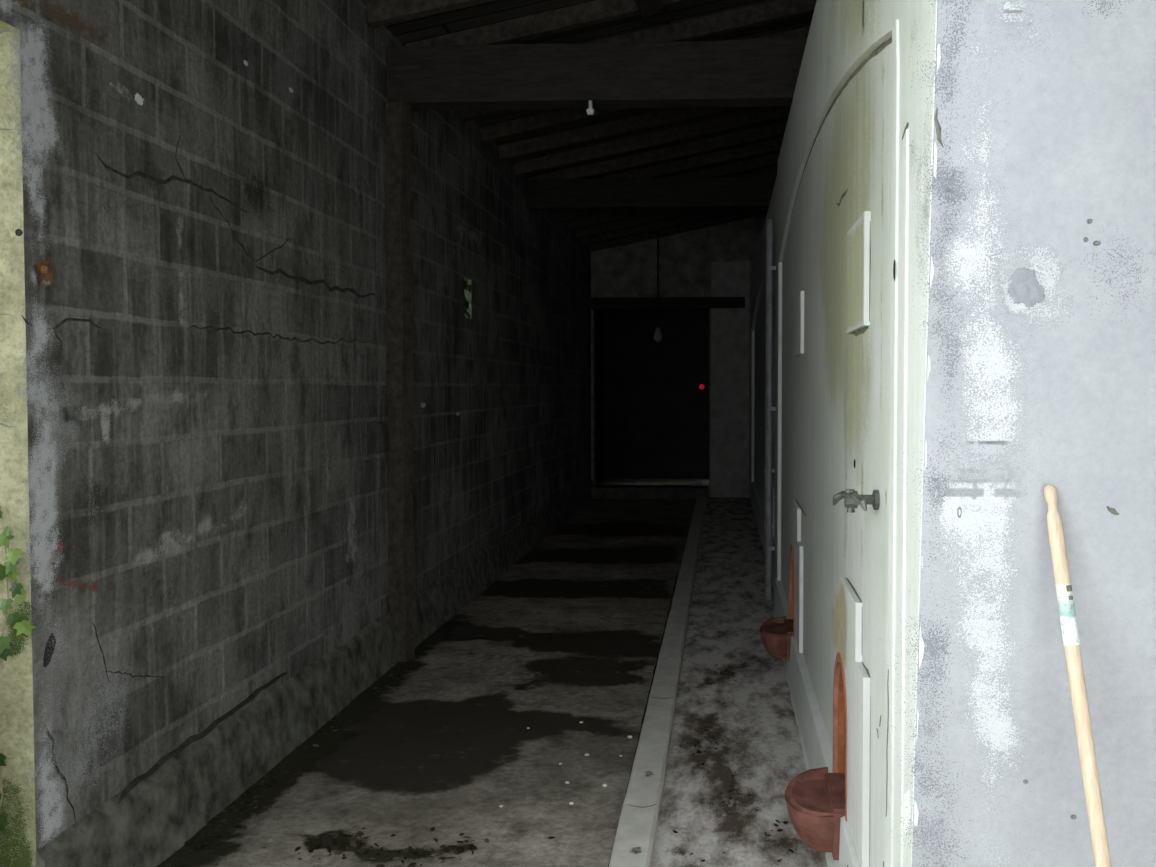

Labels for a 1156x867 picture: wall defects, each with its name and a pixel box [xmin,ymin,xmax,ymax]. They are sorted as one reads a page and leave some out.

crack [95,135,377,298]
leakage [479,521,689,600]
crack [118,673,287,805]
leakage [280,613,662,799]